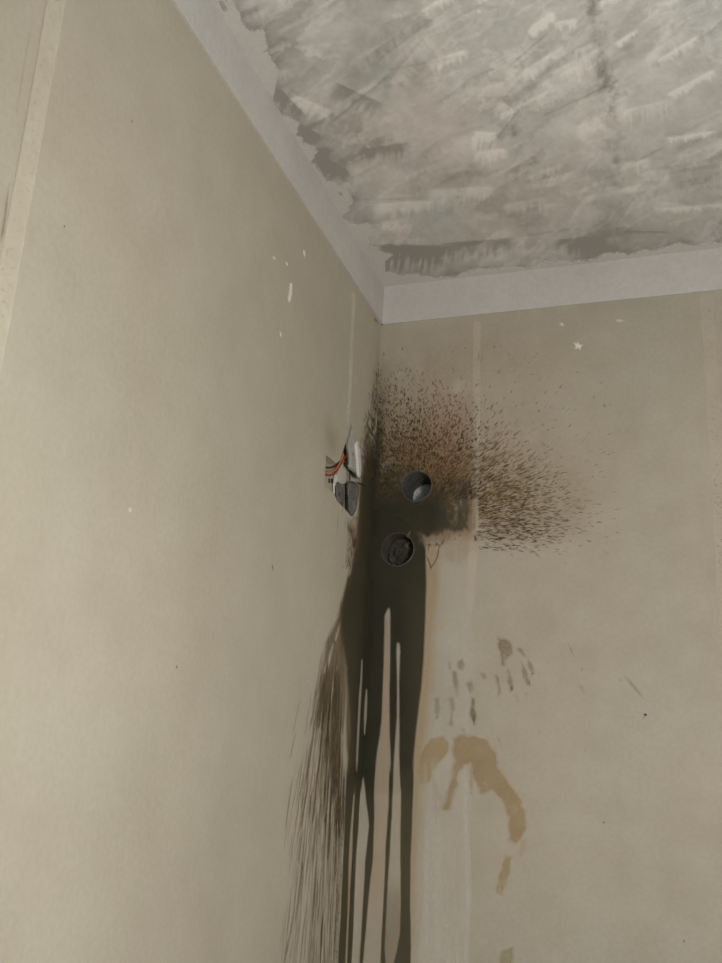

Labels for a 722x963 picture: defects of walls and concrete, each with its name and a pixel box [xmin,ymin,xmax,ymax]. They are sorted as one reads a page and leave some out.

water stain [285,363,599,963]